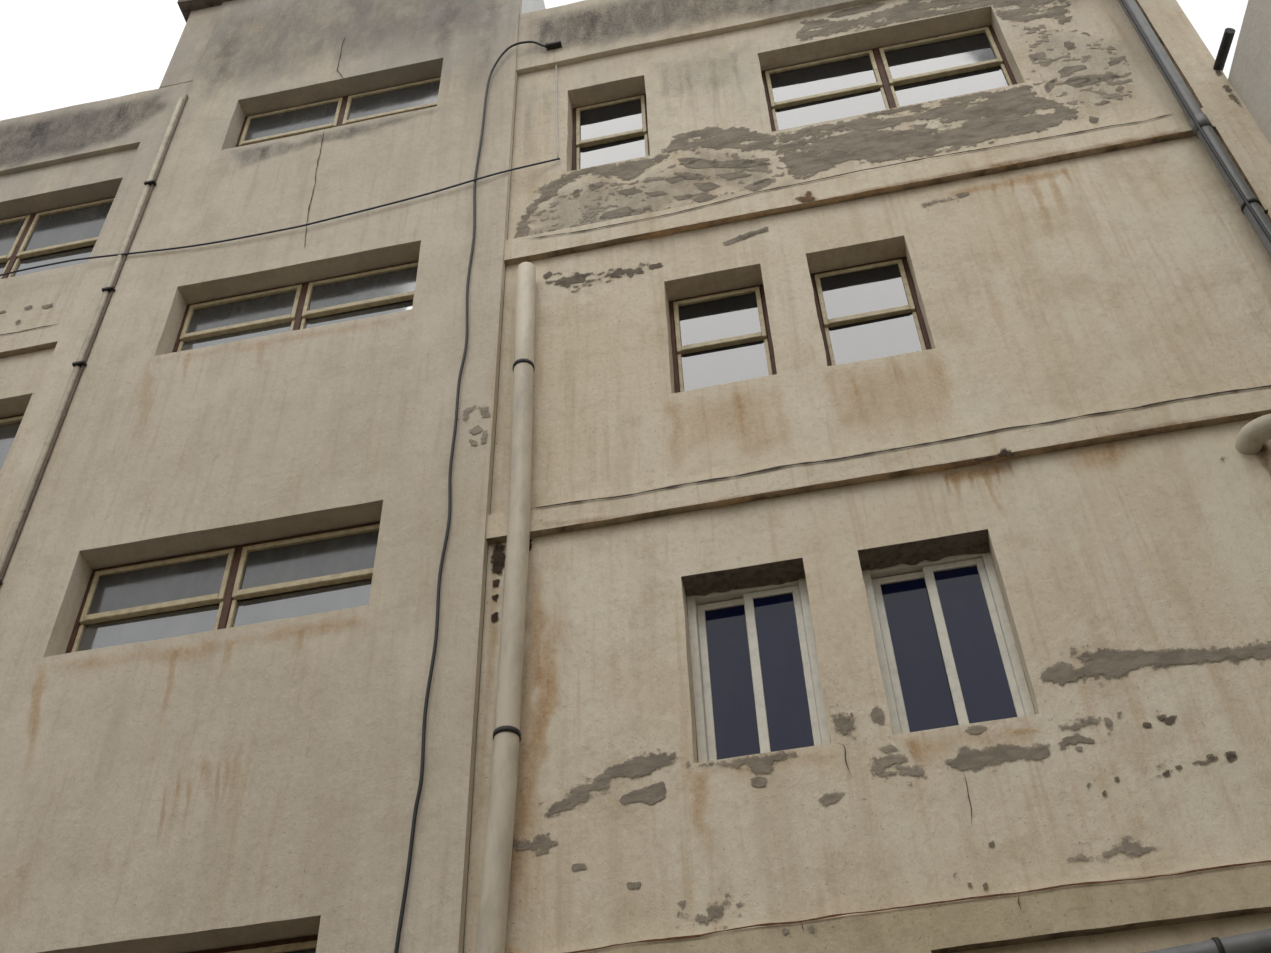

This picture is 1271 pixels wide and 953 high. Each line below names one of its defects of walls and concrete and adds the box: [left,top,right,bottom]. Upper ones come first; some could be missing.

peeling [514,0,1132,238]
crack [305,133,324,242]
peeling [724,227,768,245]
peeling [543,263,663,292]
crack [531,385,1271,509]
peeling [1041,639,1271,686]
peeling [945,712,1122,771]
peeling [870,745,927,786]
peeling [512,749,797,856]
peeling [819,792,844,807]
peeling [1068,835,1156,862]
peeling [676,893,743,929]